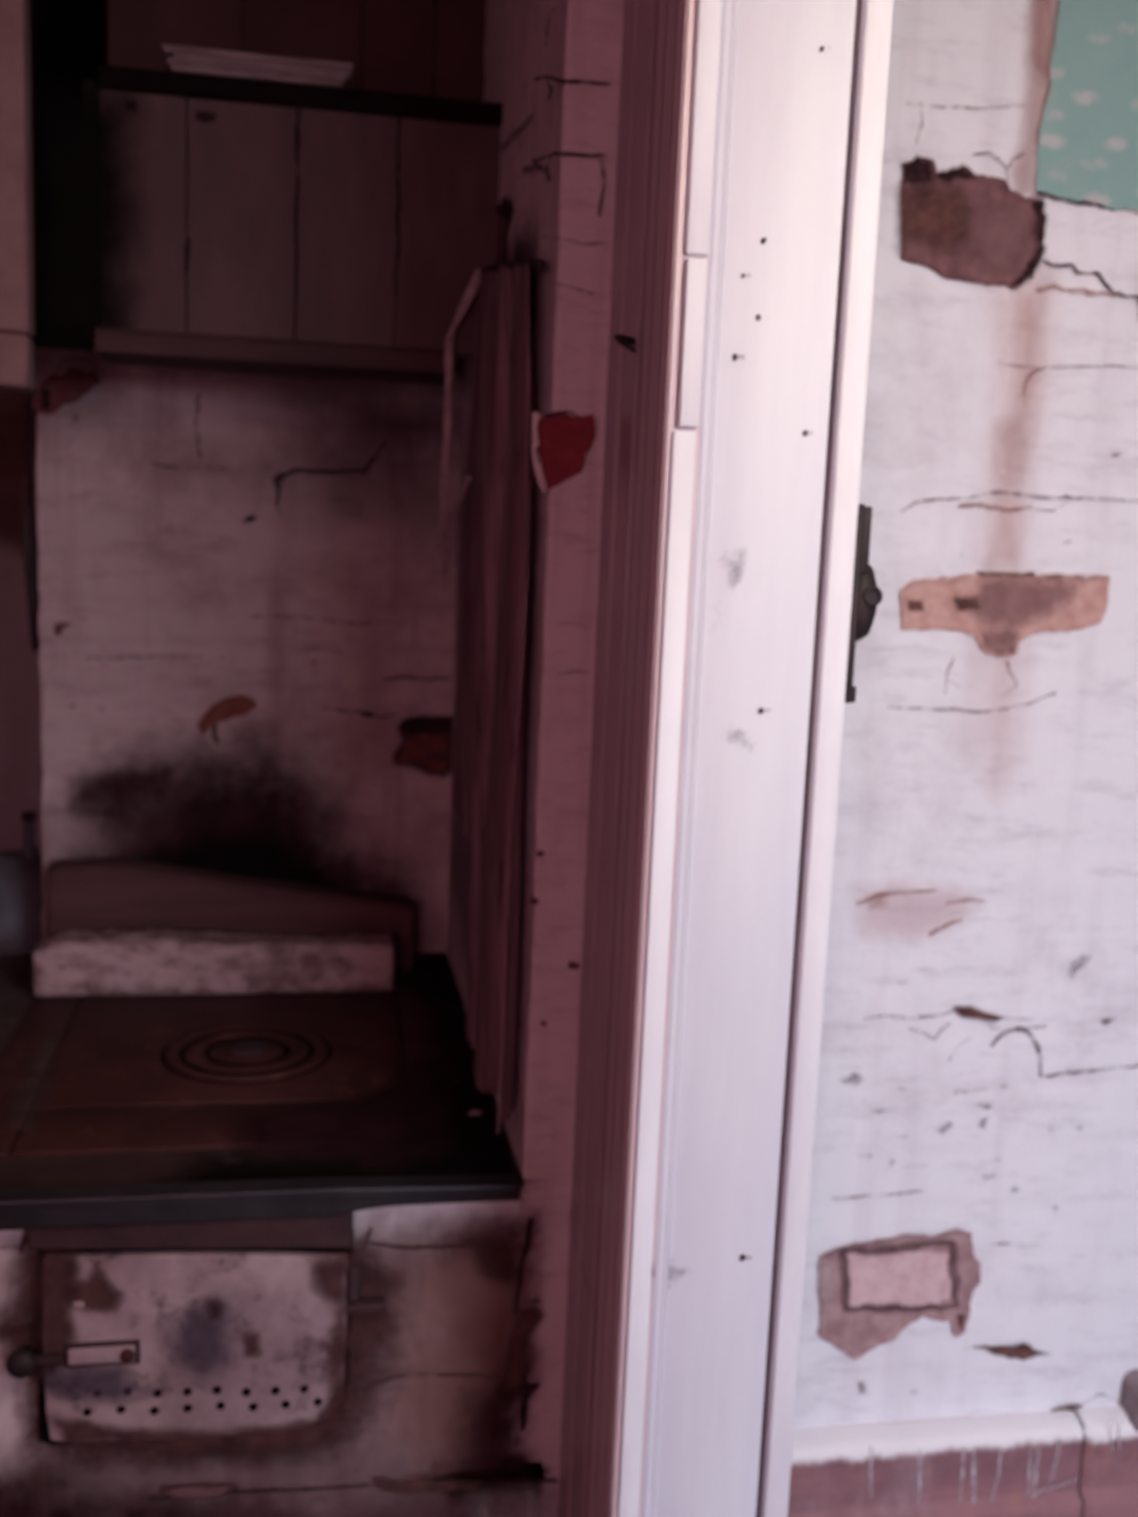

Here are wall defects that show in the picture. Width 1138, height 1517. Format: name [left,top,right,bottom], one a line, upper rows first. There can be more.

crack [497,7,610,245]
flaking render [900,156,1047,287]
crack [1036,260,1138,303]
crack [1010,365,1124,379]
crack [273,440,387,513]
flaking render [532,410,596,492]
flaking render [900,574,1110,657]
leakage [81,773,157,802]
leakage [161,801,321,885]
crack [872,1006,1138,1078]
flaking render [819,1229,981,1360]
spalling [977,1344,1047,1360]